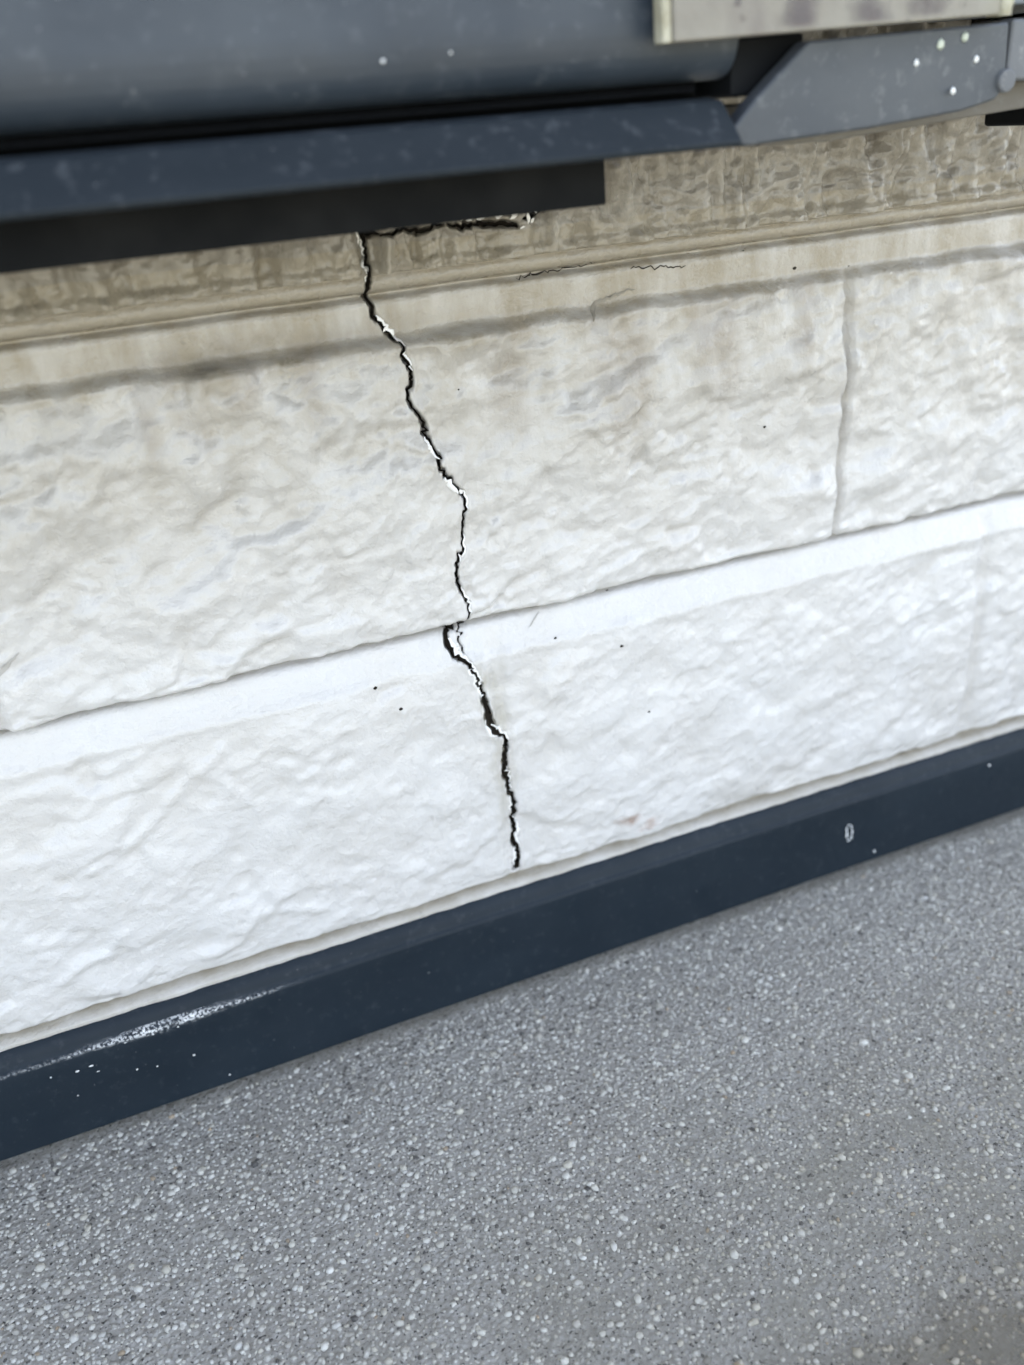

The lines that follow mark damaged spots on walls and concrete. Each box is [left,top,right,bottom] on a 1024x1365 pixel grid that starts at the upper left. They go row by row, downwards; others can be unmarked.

crack [356,212,539,868]